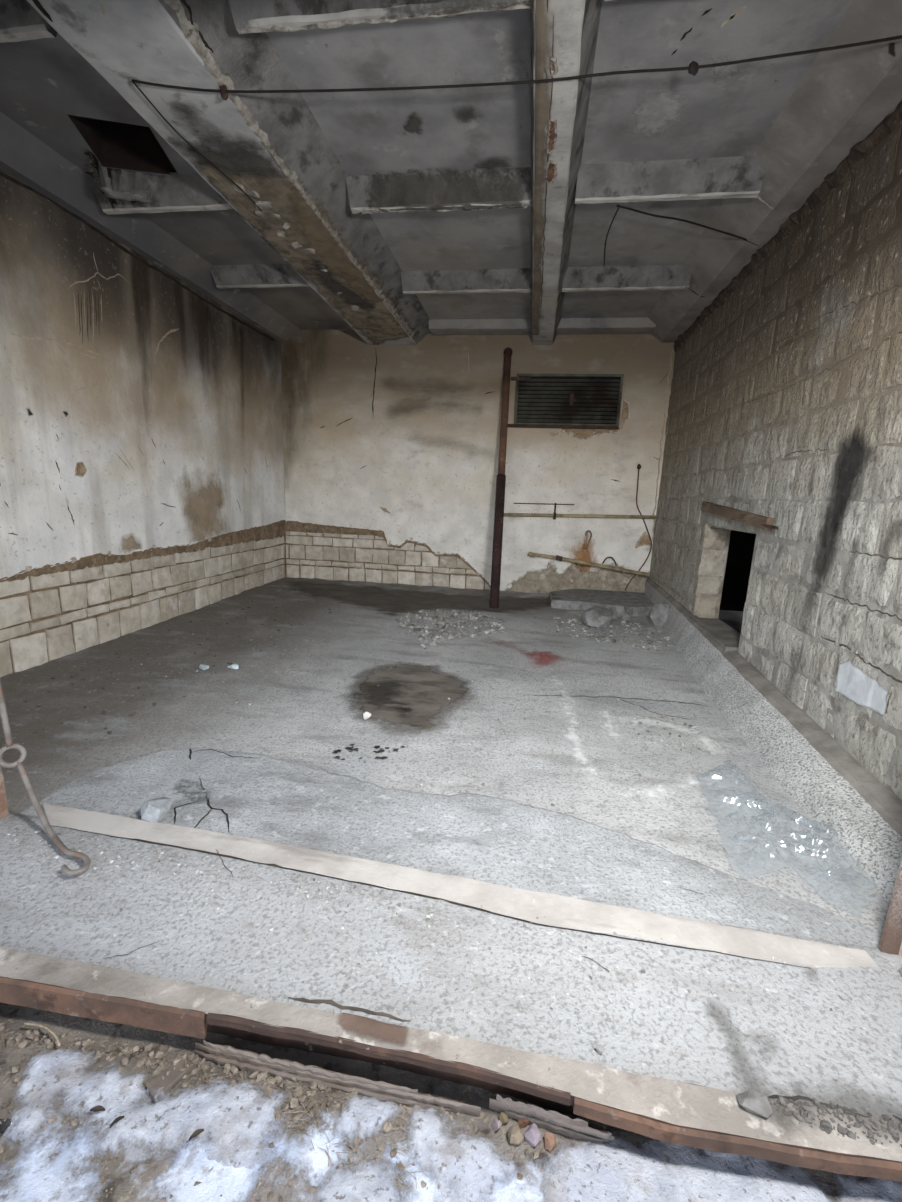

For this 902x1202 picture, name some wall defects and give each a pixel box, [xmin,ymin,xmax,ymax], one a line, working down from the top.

leakage [132,250,149,318]
leakage [186,481,223,541]
spalling [0,520,490,678]
spalling [505,561,649,593]
leakage [354,664,468,729]
crack [173,749,253,877]
crack [288,997,411,1021]
crack [767,1095,902,1131]